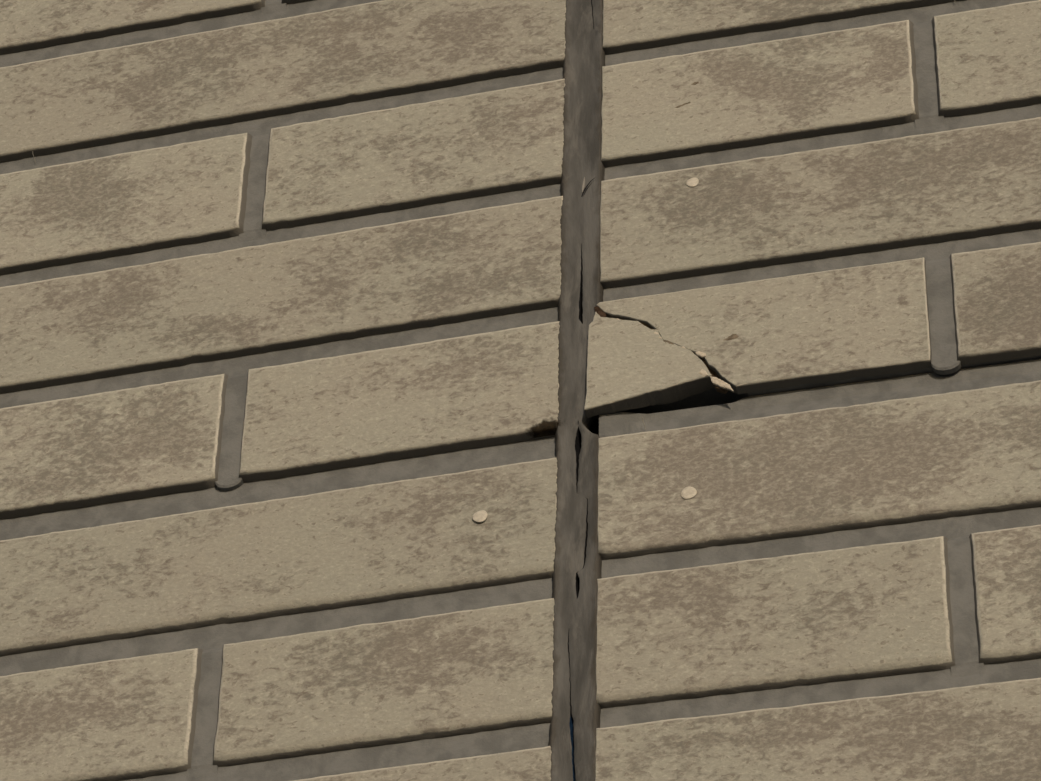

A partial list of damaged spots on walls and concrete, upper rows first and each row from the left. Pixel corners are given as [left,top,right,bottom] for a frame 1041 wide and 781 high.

crack [579,243,721,379]
crack [575,426,588,598]
crack [568,631,576,781]